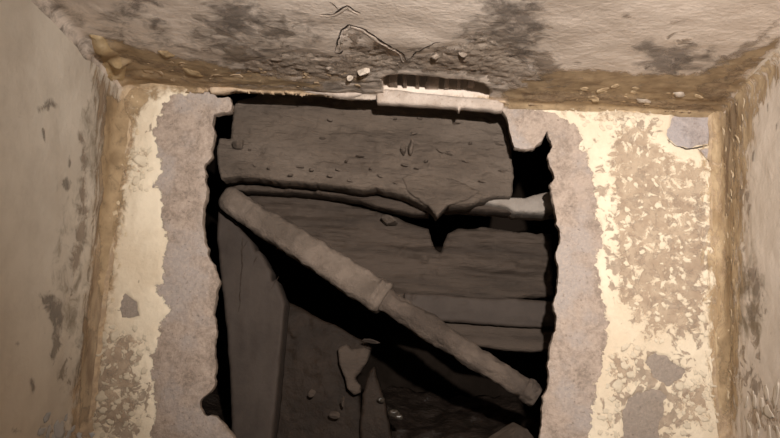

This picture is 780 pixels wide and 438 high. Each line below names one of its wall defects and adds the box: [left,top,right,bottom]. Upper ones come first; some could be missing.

leakage [211,4,257,33]
crack [320,2,438,62]
leakage [634,44,692,74]
leakage [72,134,88,272]
spalling [92,91,257,438]
spalling [230,216,516,398]
spalling [349,84,734,438]